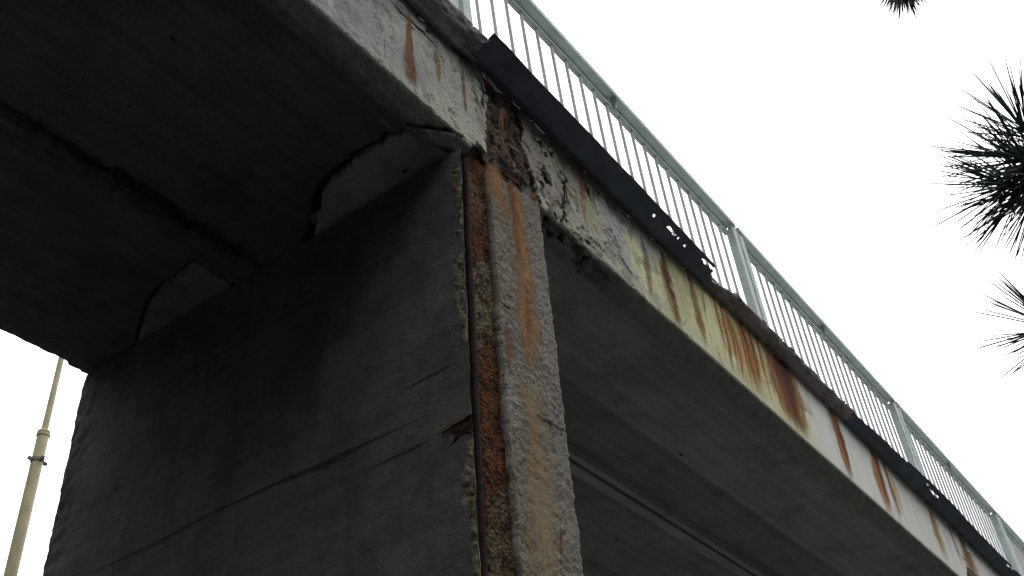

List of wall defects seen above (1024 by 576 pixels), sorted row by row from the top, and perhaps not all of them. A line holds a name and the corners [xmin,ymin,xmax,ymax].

corrosion [405,17,416,83]
corrosion [488,165,538,358]
corrosion [640,235,680,321]
spalling [441,71,545,576]
corrosion [688,275,807,428]
corrosion [828,409,850,472]
corrosion [869,448,900,512]
corrosion [928,507,977,574]